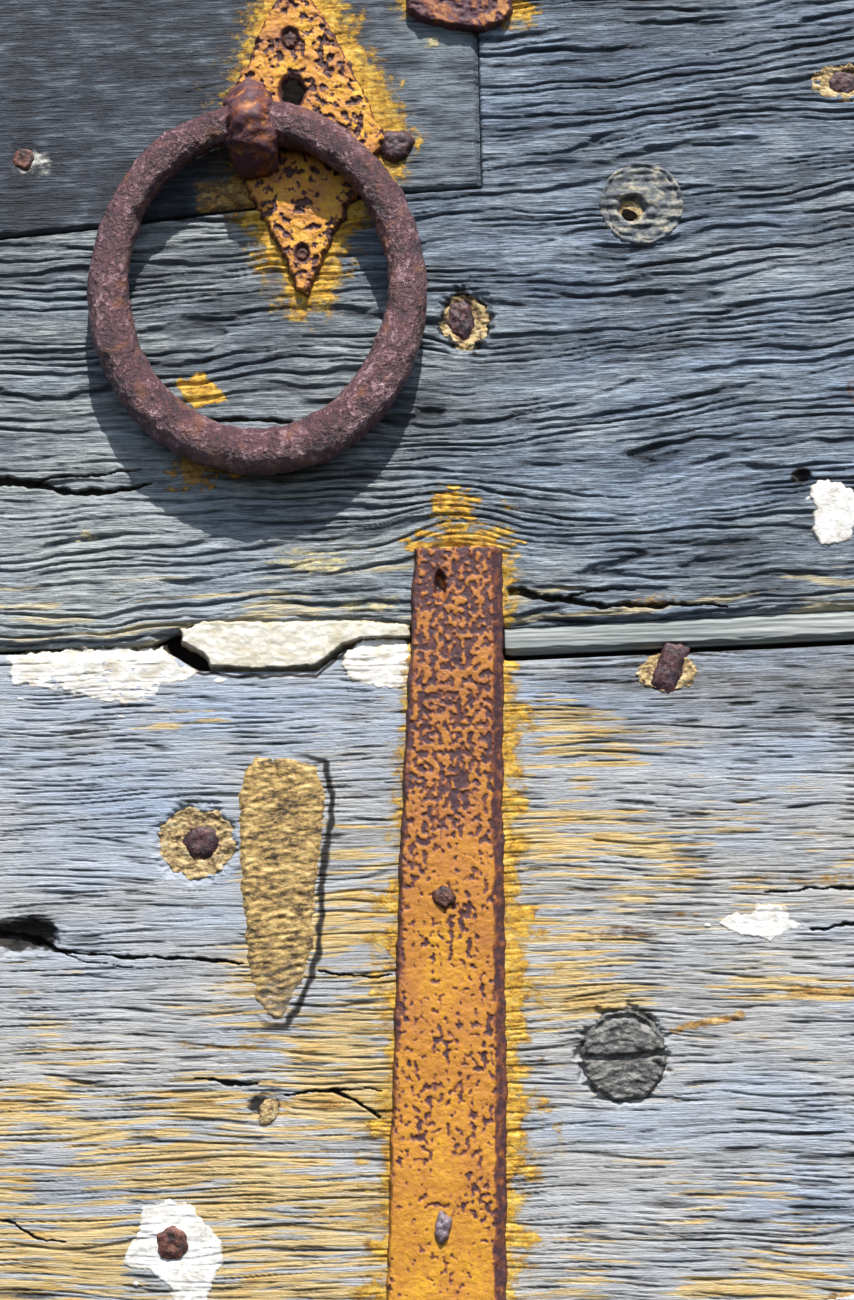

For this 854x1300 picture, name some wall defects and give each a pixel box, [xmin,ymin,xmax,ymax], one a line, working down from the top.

rust [219,0,276,107]
rust [312,0,423,149]
rust [197,147,372,322]
rust [176,372,228,408]
crack [0,469,151,496]
crack [195,651,346,679]
crack [765,885,854,893]
crack [810,922,854,931]
crack [0,932,244,968]
crack [319,970,390,978]
rust [353,644,411,1300]
rust [502,660,561,1300]